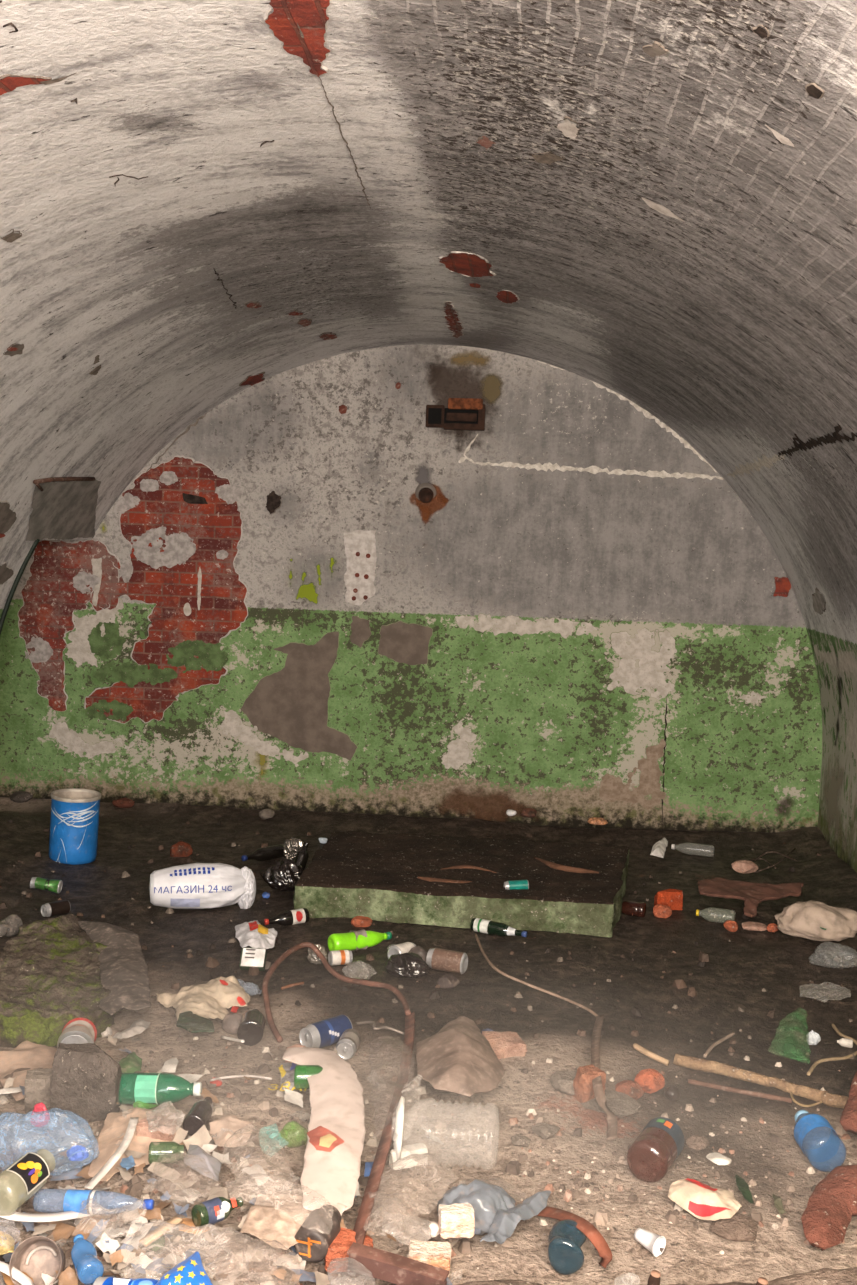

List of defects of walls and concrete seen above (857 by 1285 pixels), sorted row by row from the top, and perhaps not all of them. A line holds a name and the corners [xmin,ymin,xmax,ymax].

flaking render [263,0,331,77]
flaking render [0,73,76,95]
crack [319,77,371,209]
flaking render [438,251,520,304]
damp [428,352,502,415]
crack [778,425,857,460]
rust [410,485,449,524]
flaking render [0,455,248,759]
flaking render [220,615,433,767]